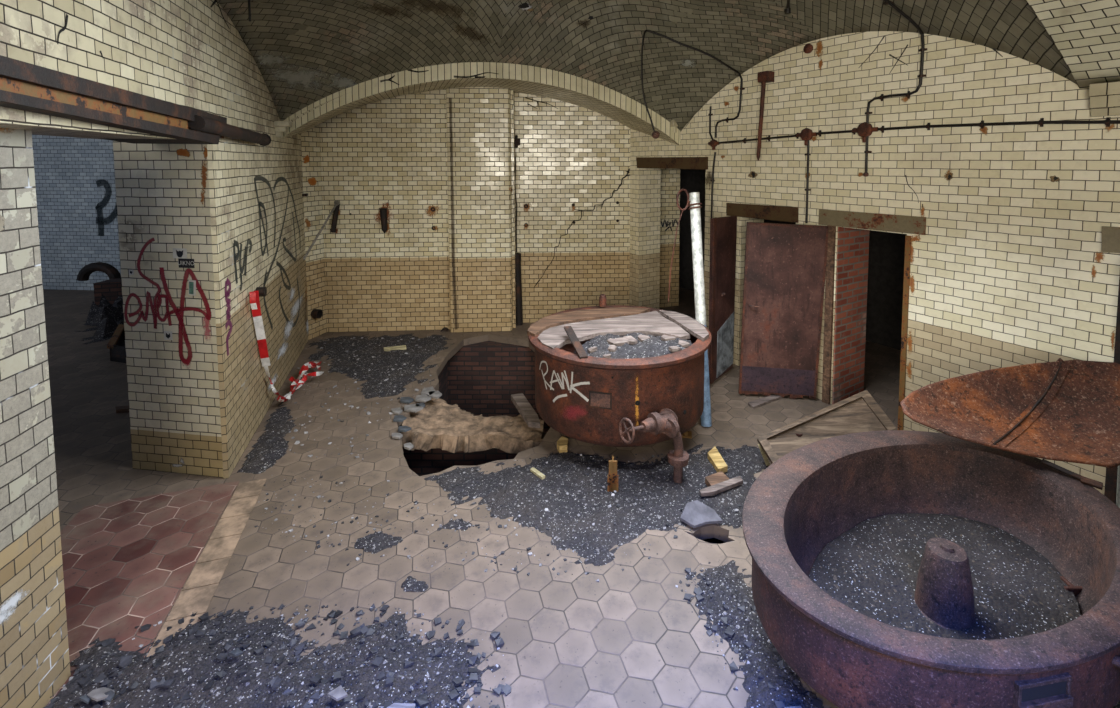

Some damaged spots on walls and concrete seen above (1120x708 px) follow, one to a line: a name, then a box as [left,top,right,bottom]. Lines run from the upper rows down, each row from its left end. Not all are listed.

crack [534,169,630,287]
spalling [264,285,550,468]
spalling [403,447,517,476]